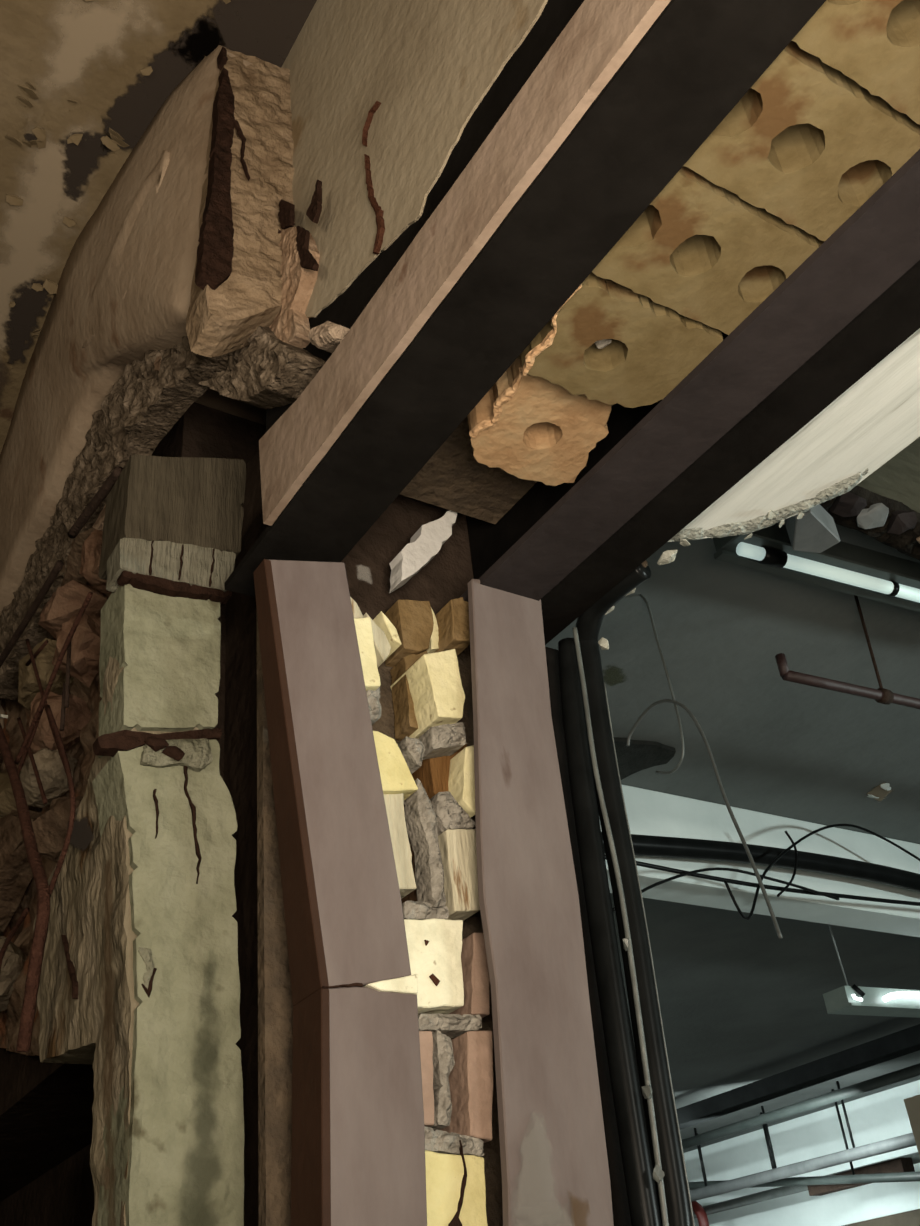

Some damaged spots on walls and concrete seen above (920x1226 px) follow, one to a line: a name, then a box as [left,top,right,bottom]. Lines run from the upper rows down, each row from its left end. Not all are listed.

crack [362,101,385,255]
spalling [670,468,920,561]
spalling [0,336,236,1056]
crack [93,728,222,884]
crack [322,981,363,989]
crack [448,1140,467,1226]